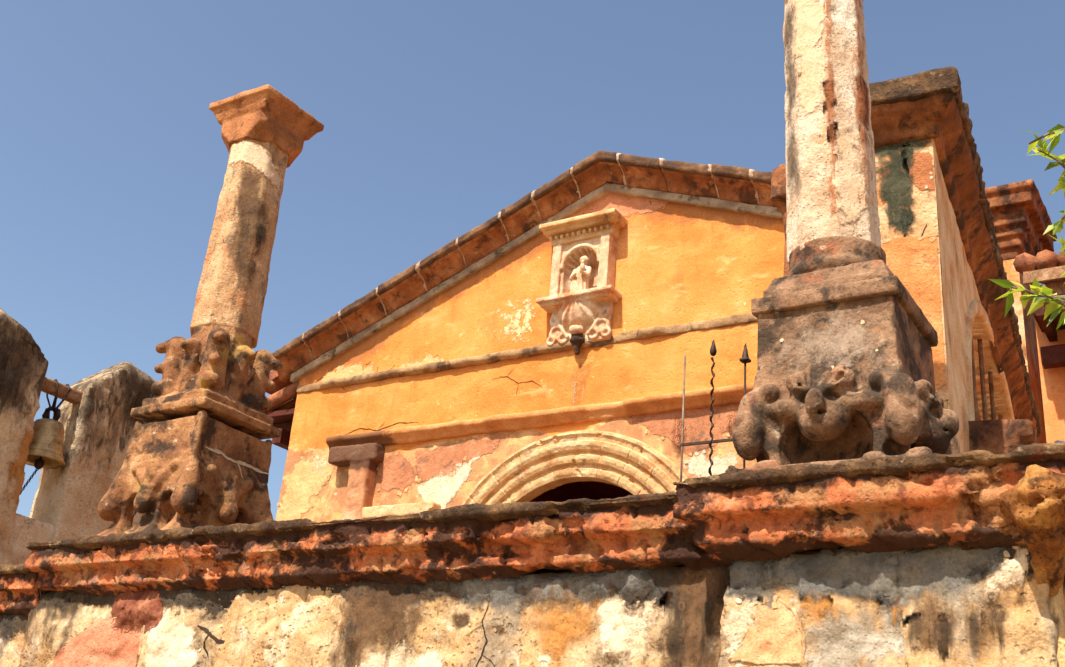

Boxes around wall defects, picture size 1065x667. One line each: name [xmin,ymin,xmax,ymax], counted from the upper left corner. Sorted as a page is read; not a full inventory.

flaking render [831,133,869,224]
leakage [874,138,930,233]
leakage [232,170,265,286]
flaking render [486,299,536,342]
crack [205,446,269,478]
crack [345,422,413,435]
flaking render [377,436,500,509]
flaking render [51,610,202,667]
crack [197,625,225,657]
crack [466,599,495,667]
leakage [660,544,1006,667]